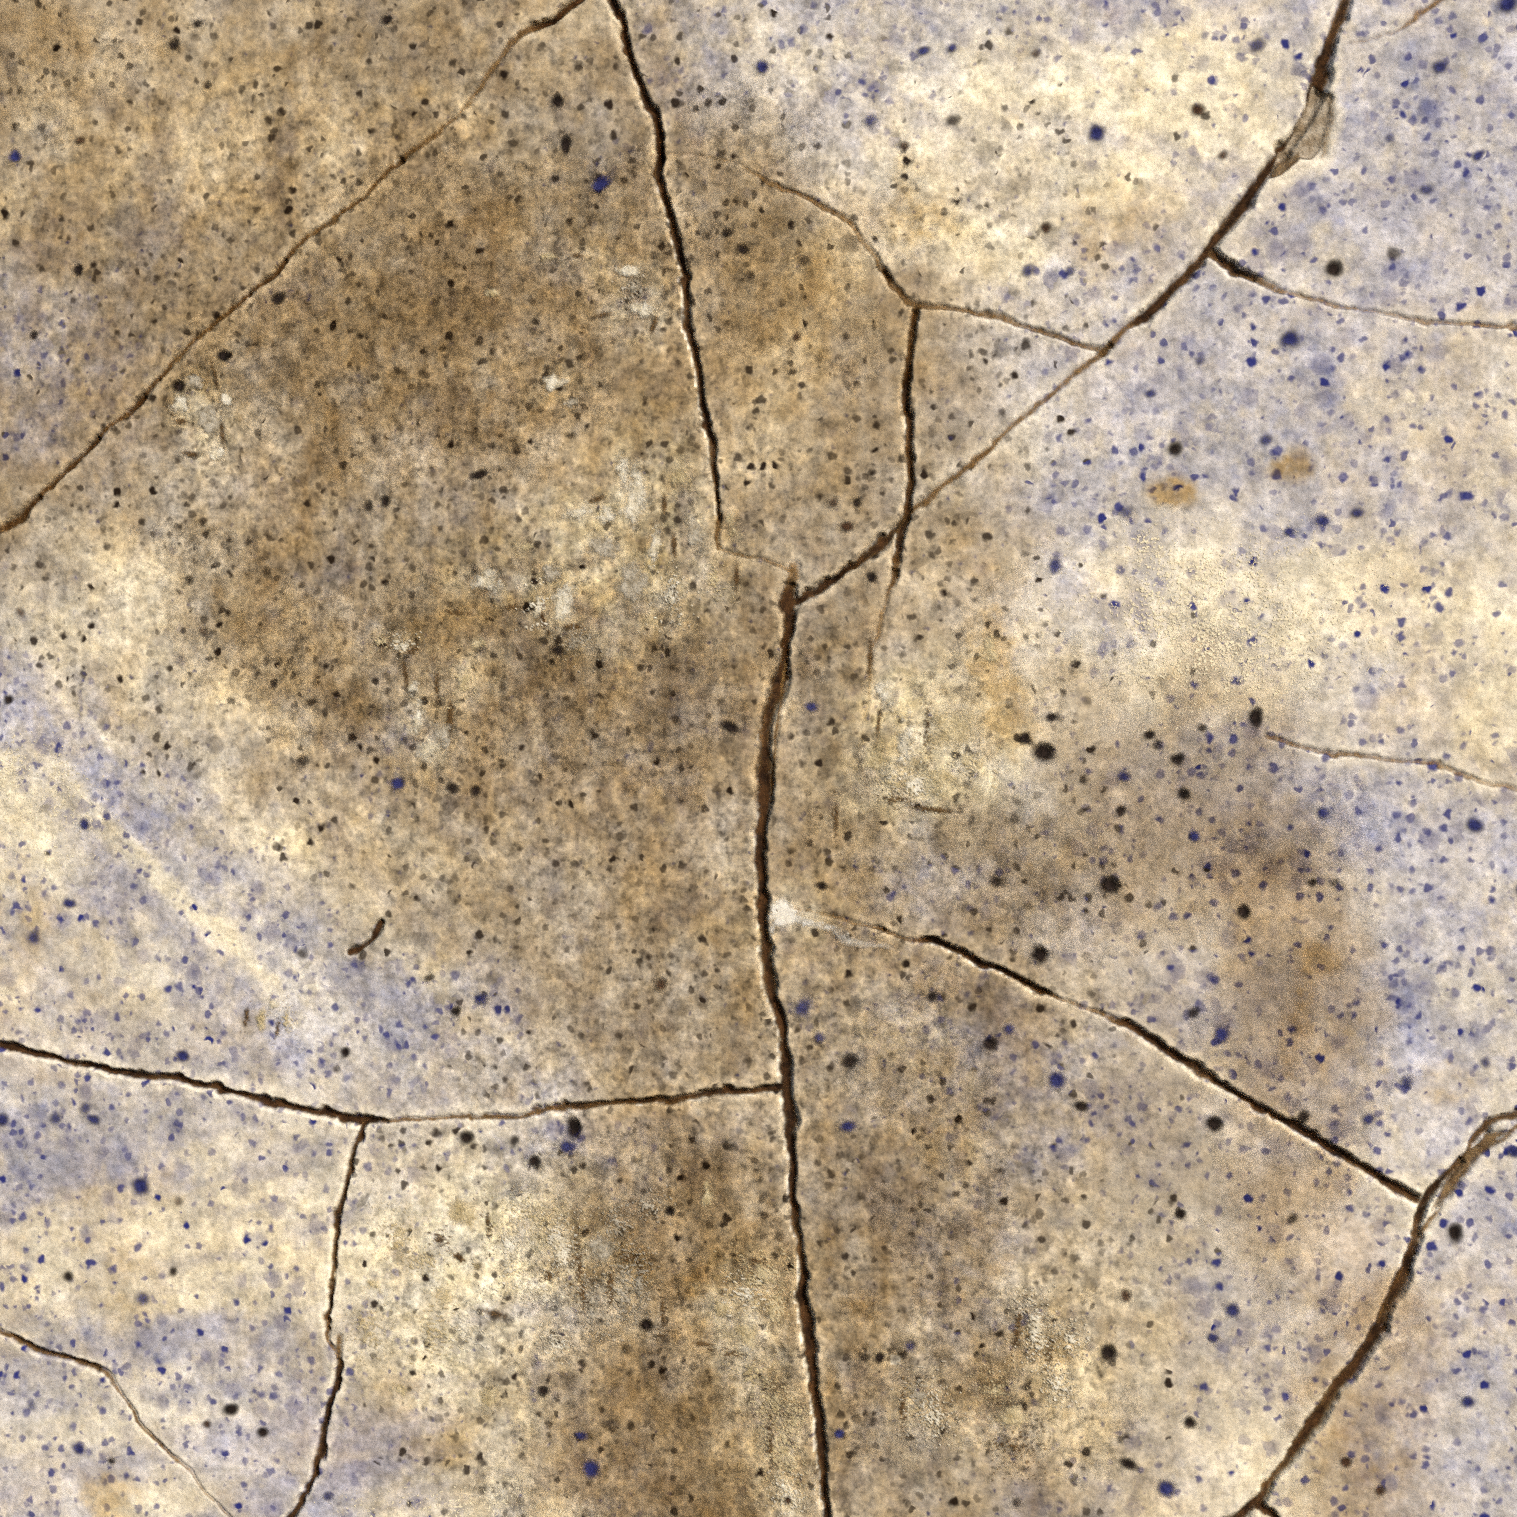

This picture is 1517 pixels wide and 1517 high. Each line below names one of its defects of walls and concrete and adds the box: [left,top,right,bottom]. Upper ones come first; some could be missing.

crack [0,0,584,532]
crack [608,0,750,558]
crack [760,176,873,253]
crack [794,0,1350,605]
crack [1406,0,1441,25]
crack [1386,314,1517,330]
crack [1267,736,1514,789]
crack [0,563,830,1517]
crack [809,909,1517,1517]